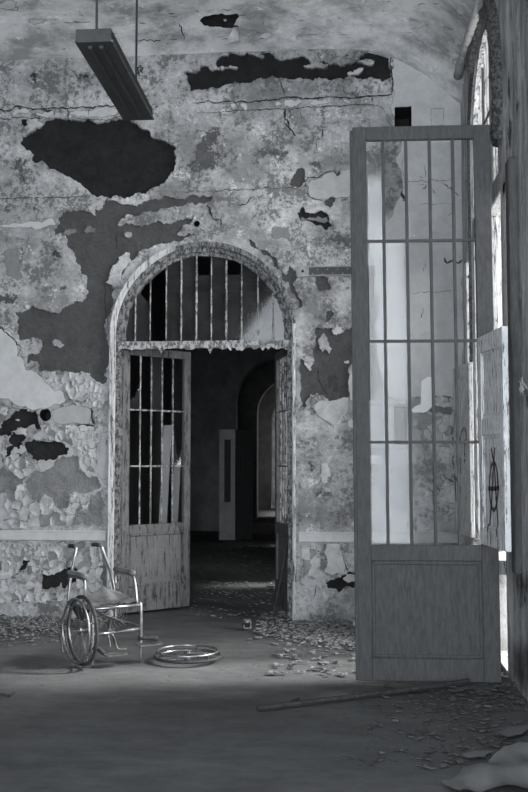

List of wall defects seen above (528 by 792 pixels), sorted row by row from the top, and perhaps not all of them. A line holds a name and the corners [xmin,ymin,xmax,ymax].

crack [138,7,185,44]
spalling [200,13,239,44]
spalling [186,53,391,91]
crack [0,105,121,121]
peeling [187,127,226,172]
spalling [290,161,320,187]
spalling [298,197,351,248]
spalling [0,119,213,408]
spalling [315,276,331,292]
spalling [299,311,353,428]
spalling [0,407,105,530]
peeling [309,463,332,498]